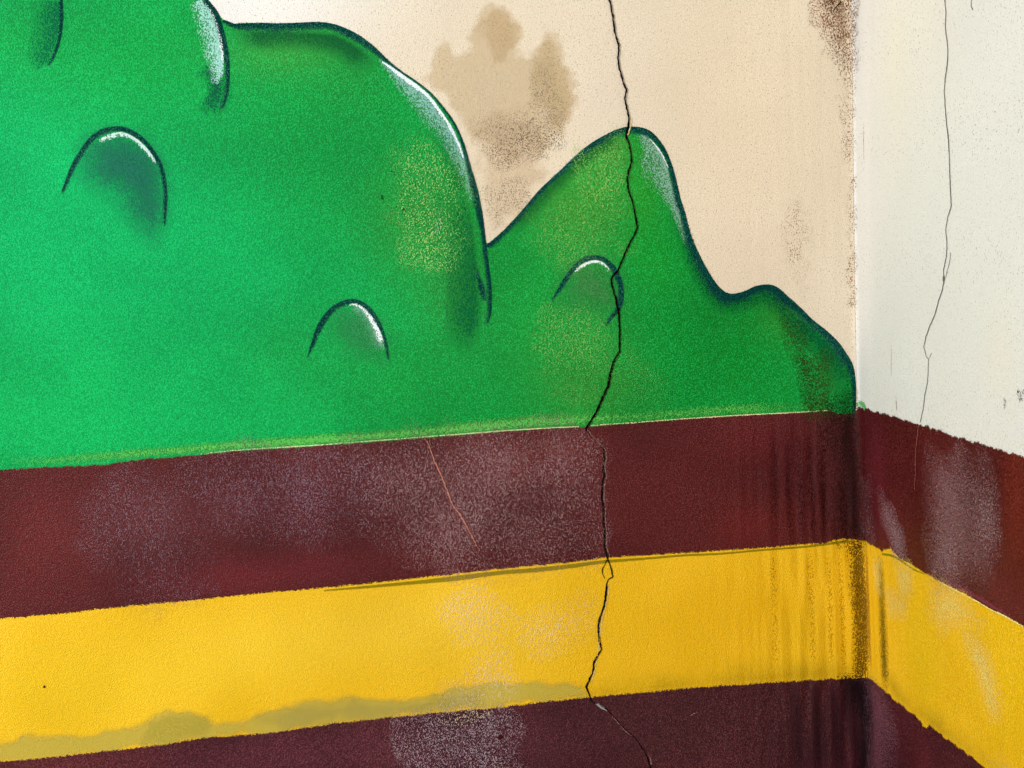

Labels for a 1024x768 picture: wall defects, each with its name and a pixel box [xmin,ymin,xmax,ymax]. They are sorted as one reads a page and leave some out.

crack [585,0,652,768]
crack [914,0,951,490]